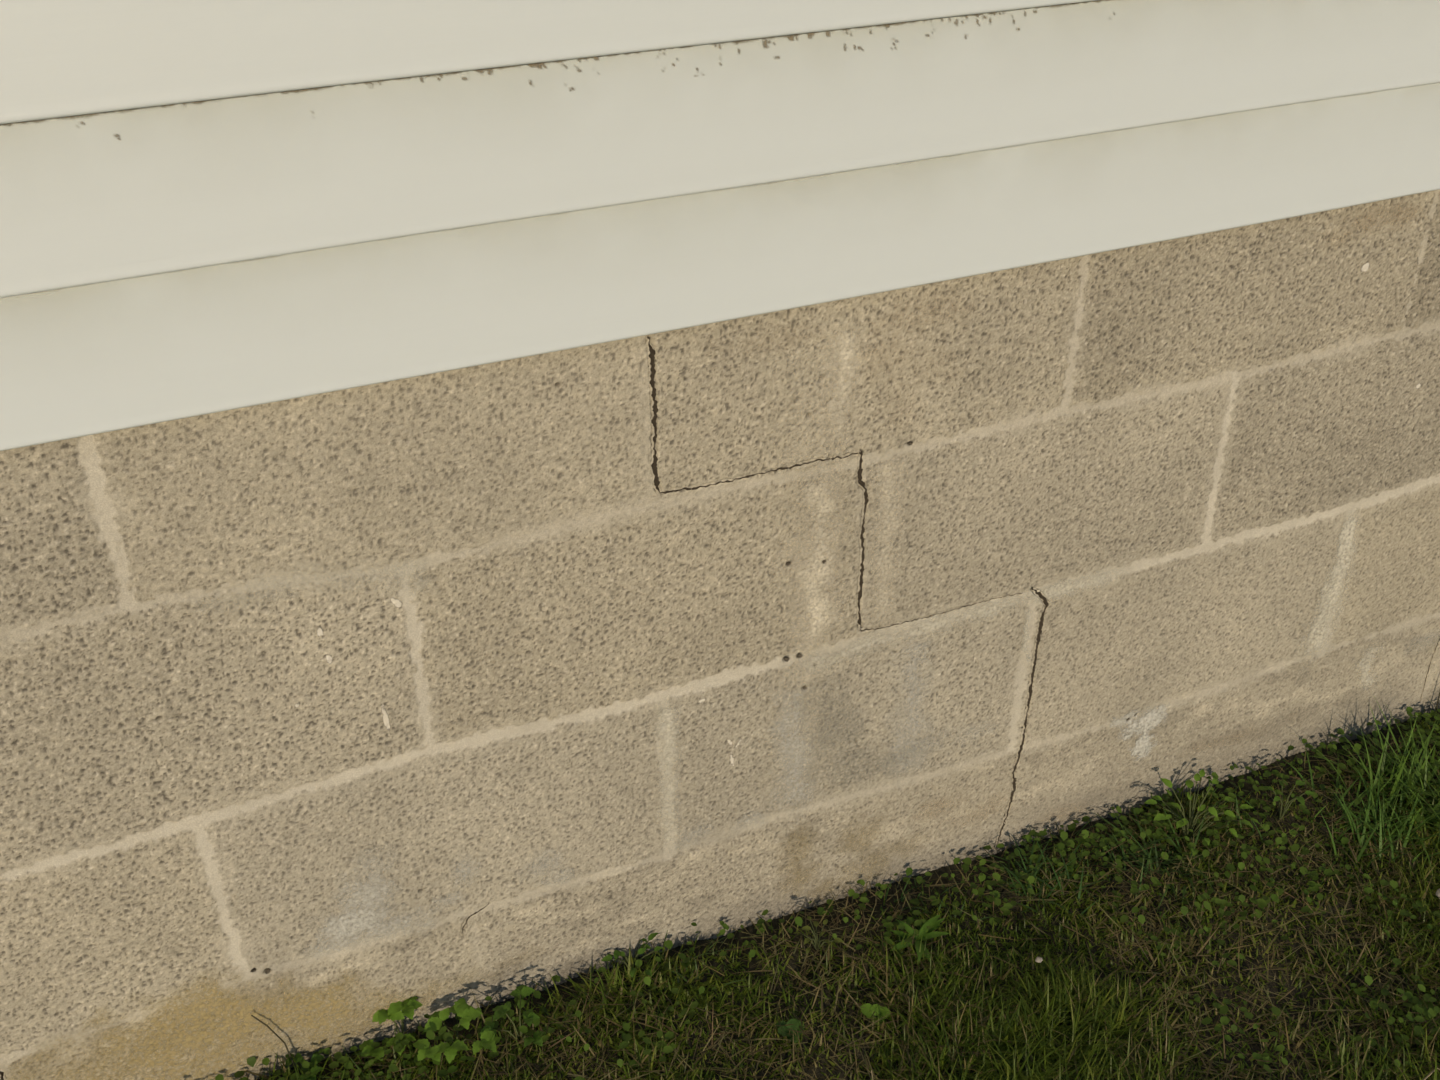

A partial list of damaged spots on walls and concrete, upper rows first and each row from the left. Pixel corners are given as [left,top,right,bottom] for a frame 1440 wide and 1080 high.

crack [646,336,1049,850]